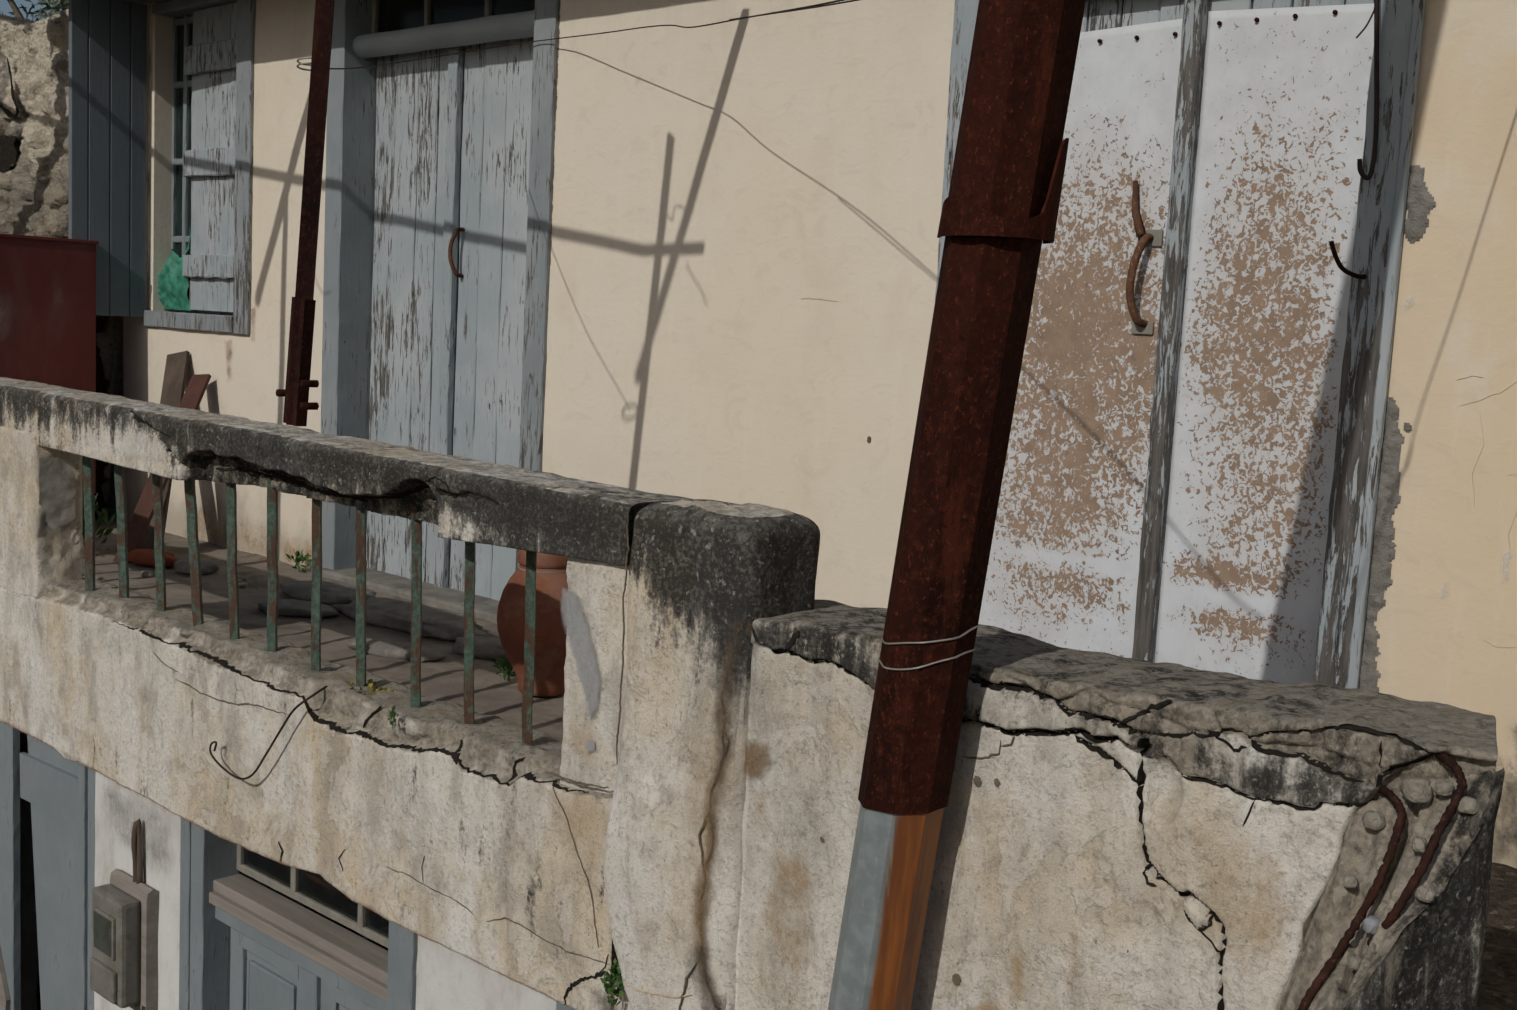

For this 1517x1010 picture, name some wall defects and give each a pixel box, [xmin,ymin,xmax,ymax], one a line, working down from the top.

spalling [1404,165,1436,243]
crack [130,410,196,468]
spalling [1358,397,1412,692]
crack [1458,376,1516,507]
crack [153,652,285,714]
crack [385,508,867,1010]
crack [961,677,1438,1010]
spalling [1297,753,1479,1010]